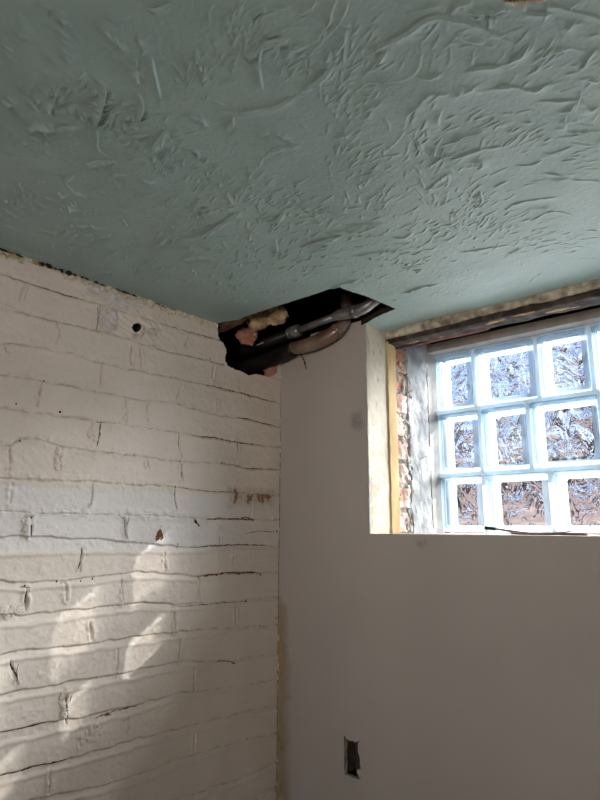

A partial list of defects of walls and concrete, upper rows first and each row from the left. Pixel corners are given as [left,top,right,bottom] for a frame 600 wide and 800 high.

corrosion [234,489,271,504]